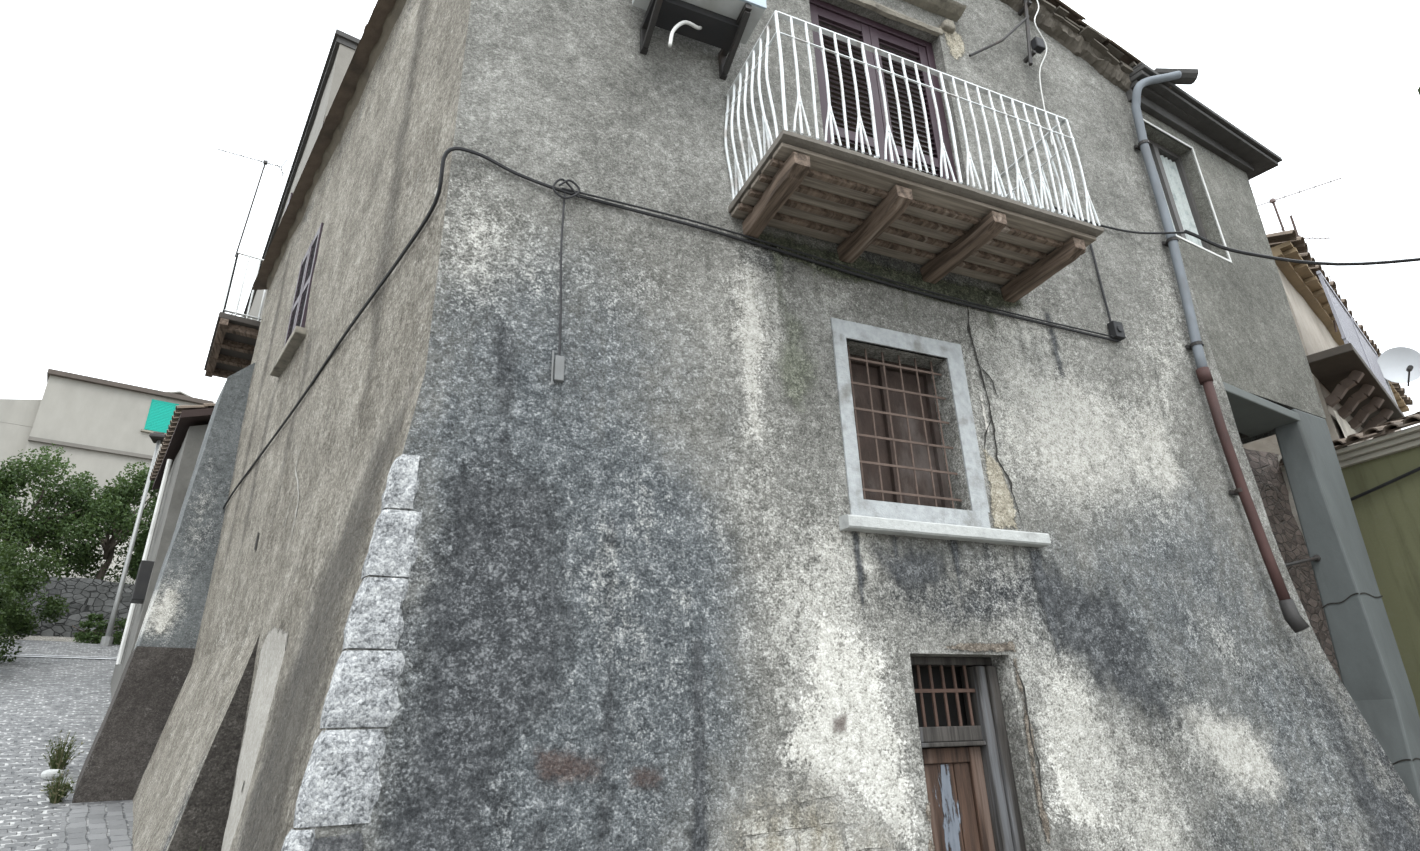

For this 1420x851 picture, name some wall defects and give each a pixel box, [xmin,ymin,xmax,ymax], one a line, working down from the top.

water stain [496,323,514,460]
crack [967,307,1022,521]
flaking render [975,382,1018,531]
water stain [382,468,576,851]
water stain [598,675,616,851]
water stain [690,639,710,851]
flaking render [728,773,892,851]
flaking render [834,716,846,730]
flaking render [942,641,1071,851]
crack [1322,592,1383,609]